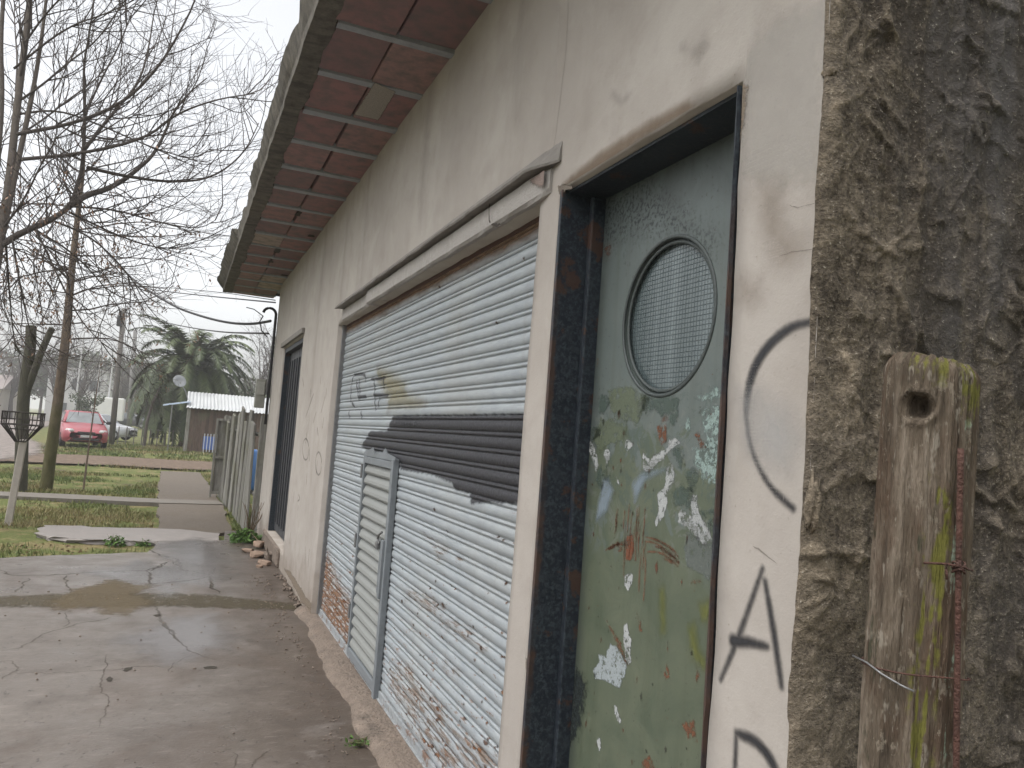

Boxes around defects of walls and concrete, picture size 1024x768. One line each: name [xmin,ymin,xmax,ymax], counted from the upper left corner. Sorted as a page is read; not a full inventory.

peeling [589,386,690,488]
peeling [642,387,720,579]
damp [47,540,225,615]
crack [145,549,220,593]
rust [321,556,351,643]
rust [608,508,679,600]
peeling [593,623,631,688]